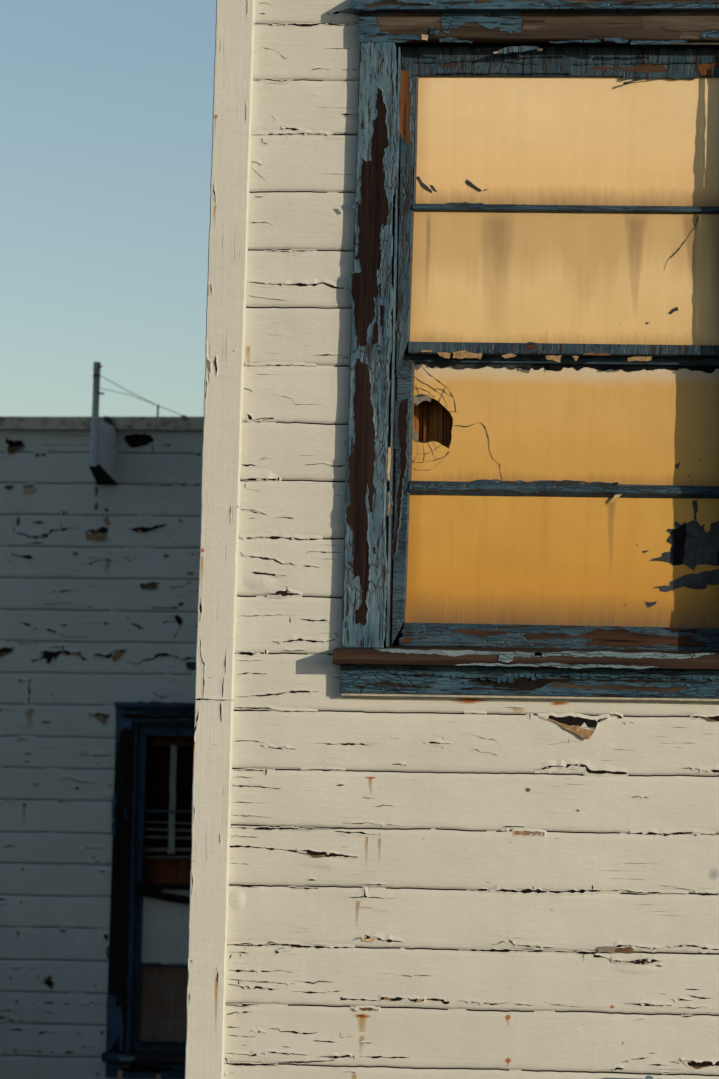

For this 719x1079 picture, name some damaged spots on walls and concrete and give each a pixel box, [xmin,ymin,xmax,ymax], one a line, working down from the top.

peeling [503,60,719,85]
peeling [343,69,428,628]
peeling [122,432,155,453]
peeling [665,519,687,565]
peeling [183,657,196,675]
peeling [537,712,610,739]
crack [459,936,719,967]
crack [187,931,410,1076]
crack [457,998,575,1009]
crack [623,987,714,1021]
crack [611,1052,679,1079]